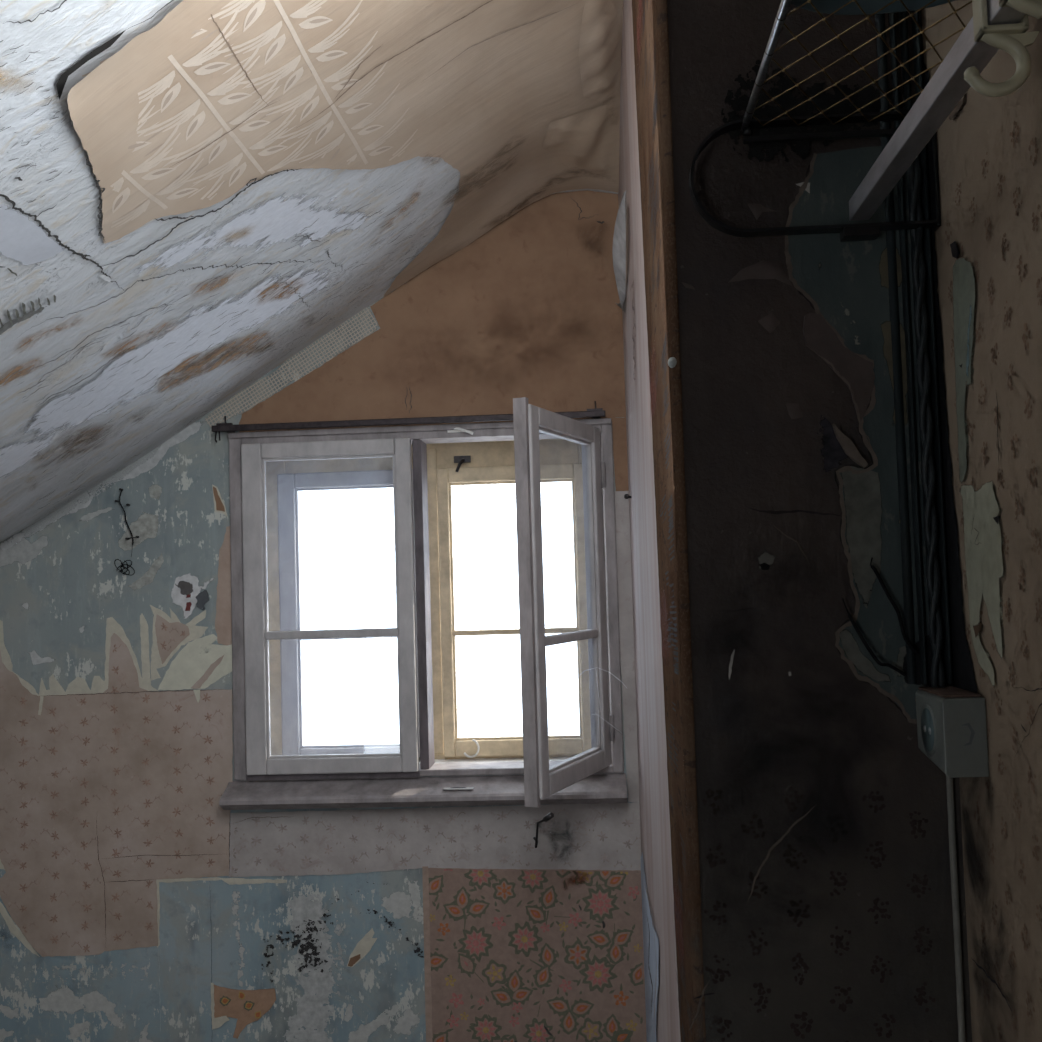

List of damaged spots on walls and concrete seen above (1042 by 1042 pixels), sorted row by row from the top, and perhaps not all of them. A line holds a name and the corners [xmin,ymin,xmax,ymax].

crack [0,0,420,509]
peeling [138,193,367,274]
peeling [0,269,331,477]
spalling [817,415,868,472]
peeling [0,421,206,567]
spalling [171,573,214,619]
peeling [381,880,422,922]
peeling [282,893,420,1042]
peeling [39,985,121,1039]